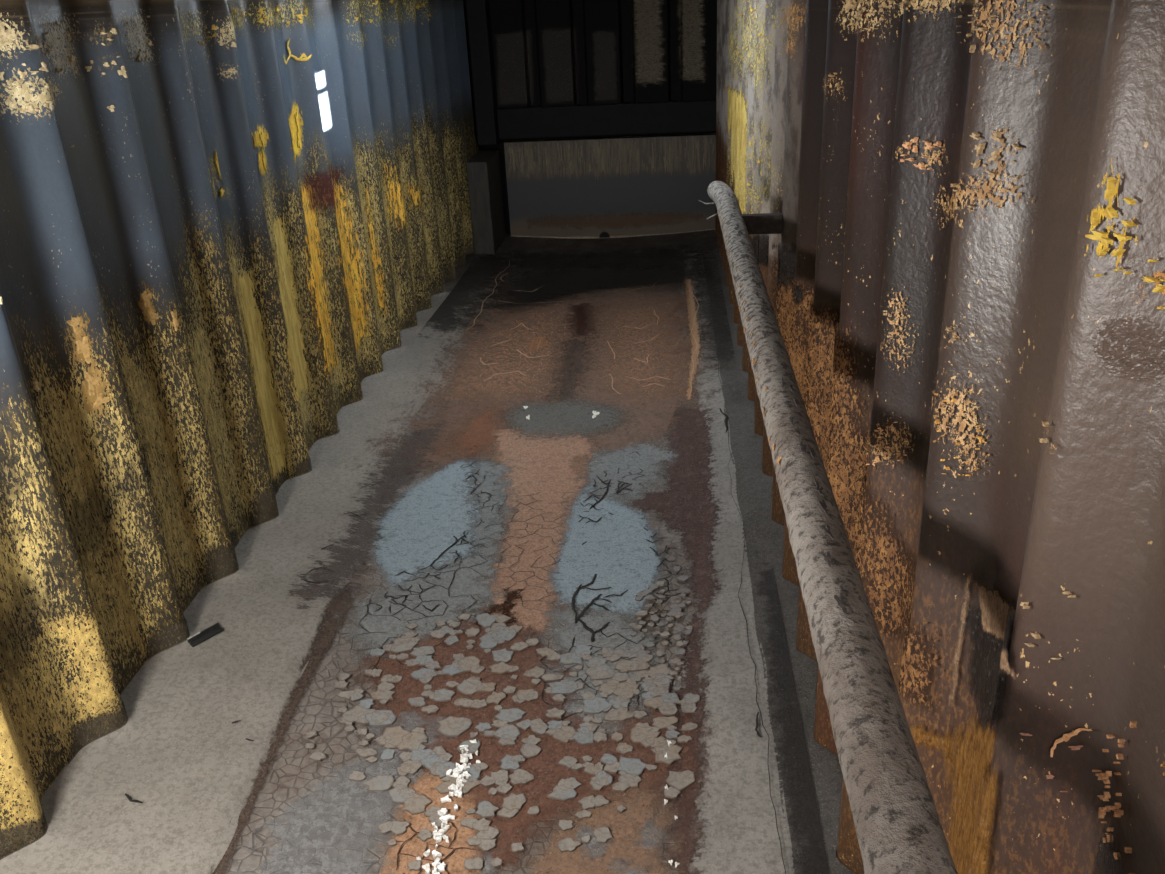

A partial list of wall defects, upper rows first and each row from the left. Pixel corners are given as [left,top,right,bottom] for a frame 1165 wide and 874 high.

corrosion [0,667,49,830]
corrosion [38,598,123,742]
corrosion [211,585,354,874]
corrosion [235,163,425,482]
leakage [290,420,518,661]
crack [385,819,475,874]
leakage [542,441,679,735]
corrosion [719,85,1016,874]
peeling [1038,421,1058,455]
peeling [1084,158,1165,310]